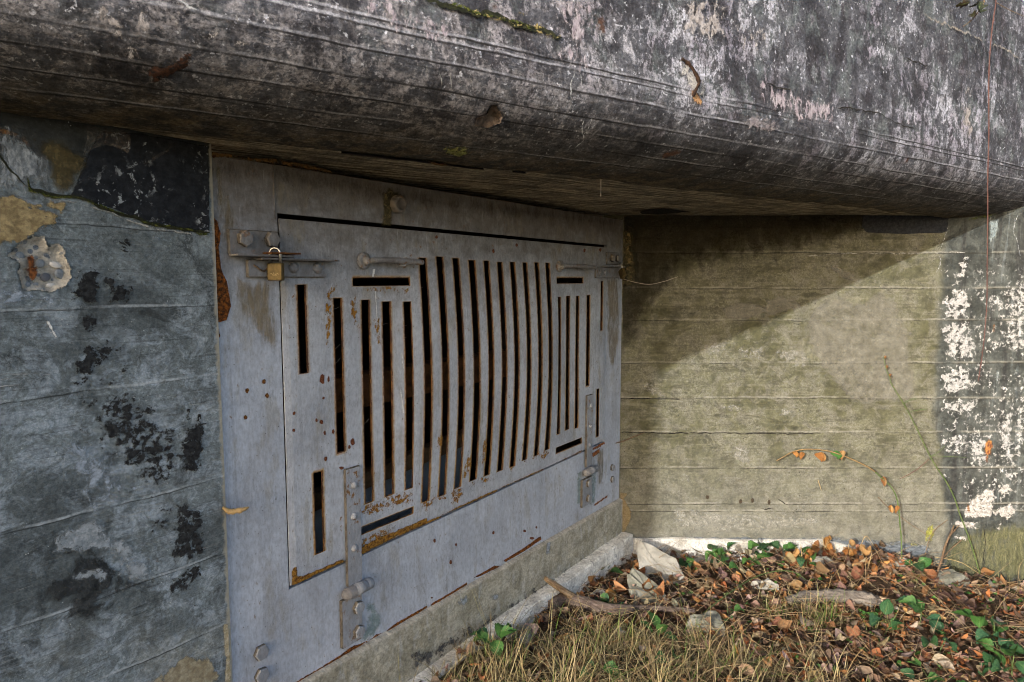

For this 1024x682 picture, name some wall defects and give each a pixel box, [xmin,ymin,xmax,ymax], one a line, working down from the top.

spalling [8,235,133,332]
corrosion [214,199,275,342]
peeling [74,340,211,497]
peeling [151,503,205,593]
corrosion [362,439,549,554]
corrosion [565,442,605,482]